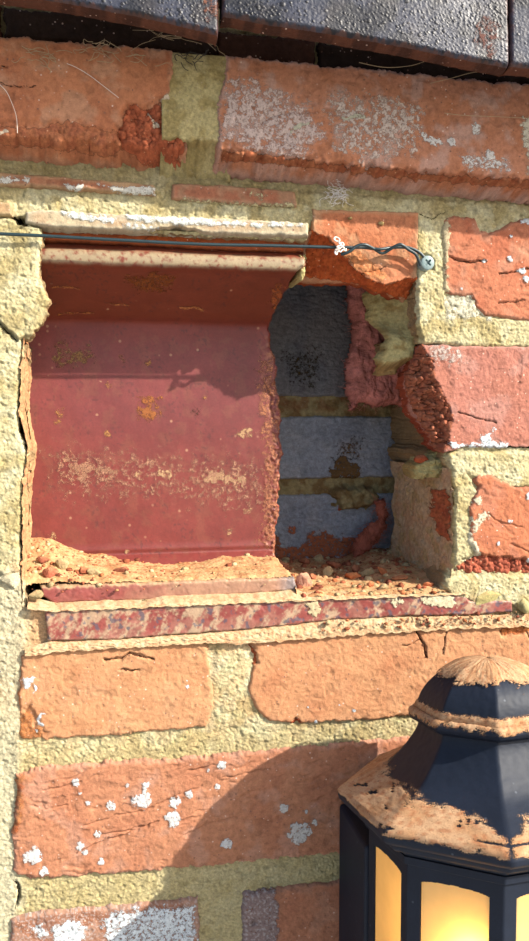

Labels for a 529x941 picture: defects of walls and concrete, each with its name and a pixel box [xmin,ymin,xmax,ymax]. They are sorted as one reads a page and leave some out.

spalling [0,104,185,168]
spalling [304,230,418,300]
spalling [404,344,454,453]
spalling [456,555,529,574]
crack [404,631,447,658]
leakage [30,920,88,941]
leakage [100,903,199,941]